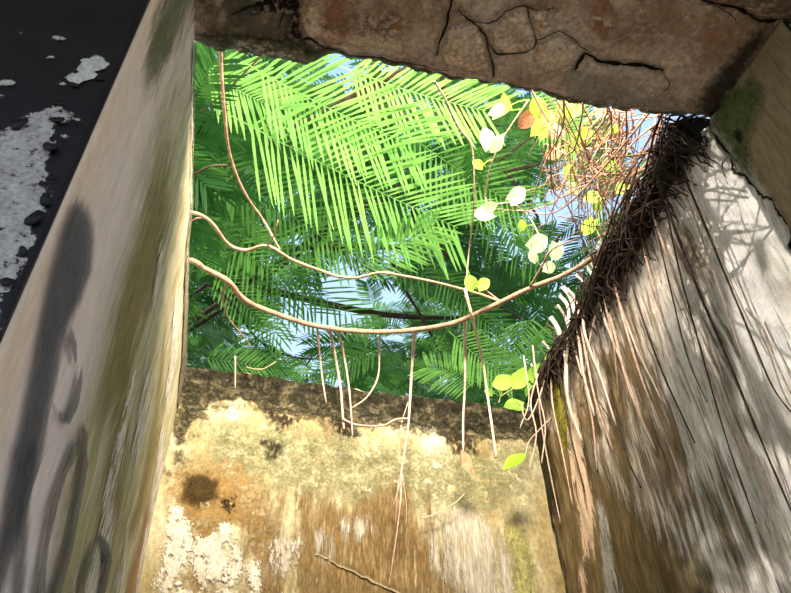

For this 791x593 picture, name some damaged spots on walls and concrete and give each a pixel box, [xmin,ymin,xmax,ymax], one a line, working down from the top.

peeling [59,51,113,87]
crack [227,0,670,93]
crack [702,0,791,23]
peeling [0,101,81,312]
damp [259,495,284,593]
damp [297,480,520,593]